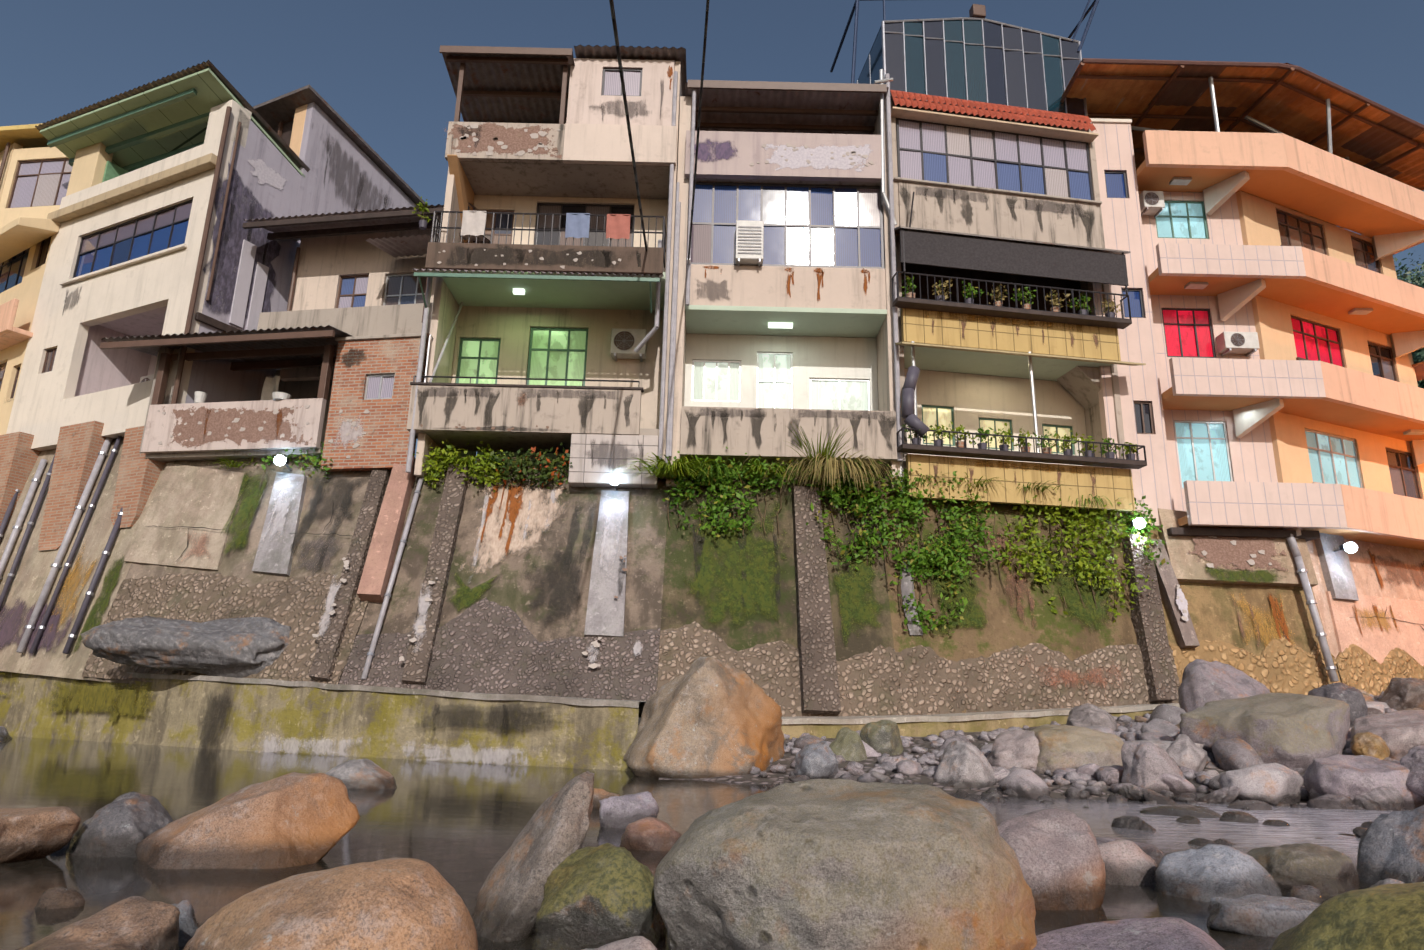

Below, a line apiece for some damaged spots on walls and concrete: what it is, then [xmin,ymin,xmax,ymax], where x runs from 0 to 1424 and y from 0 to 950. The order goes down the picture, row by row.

peeling [445,122,562,159]
peeling [750,143,876,172]
water stain [899,188,987,223]
rust [785,268,794,297]
rust [814,268,824,301]
peeling [158,405,311,448]
flaking render [328,409,370,458]
water stain [444,390,500,426]
water stain [578,396,606,427]
water stain [686,412,764,447]
water stain [836,414,896,448]
rust [481,482,523,552]